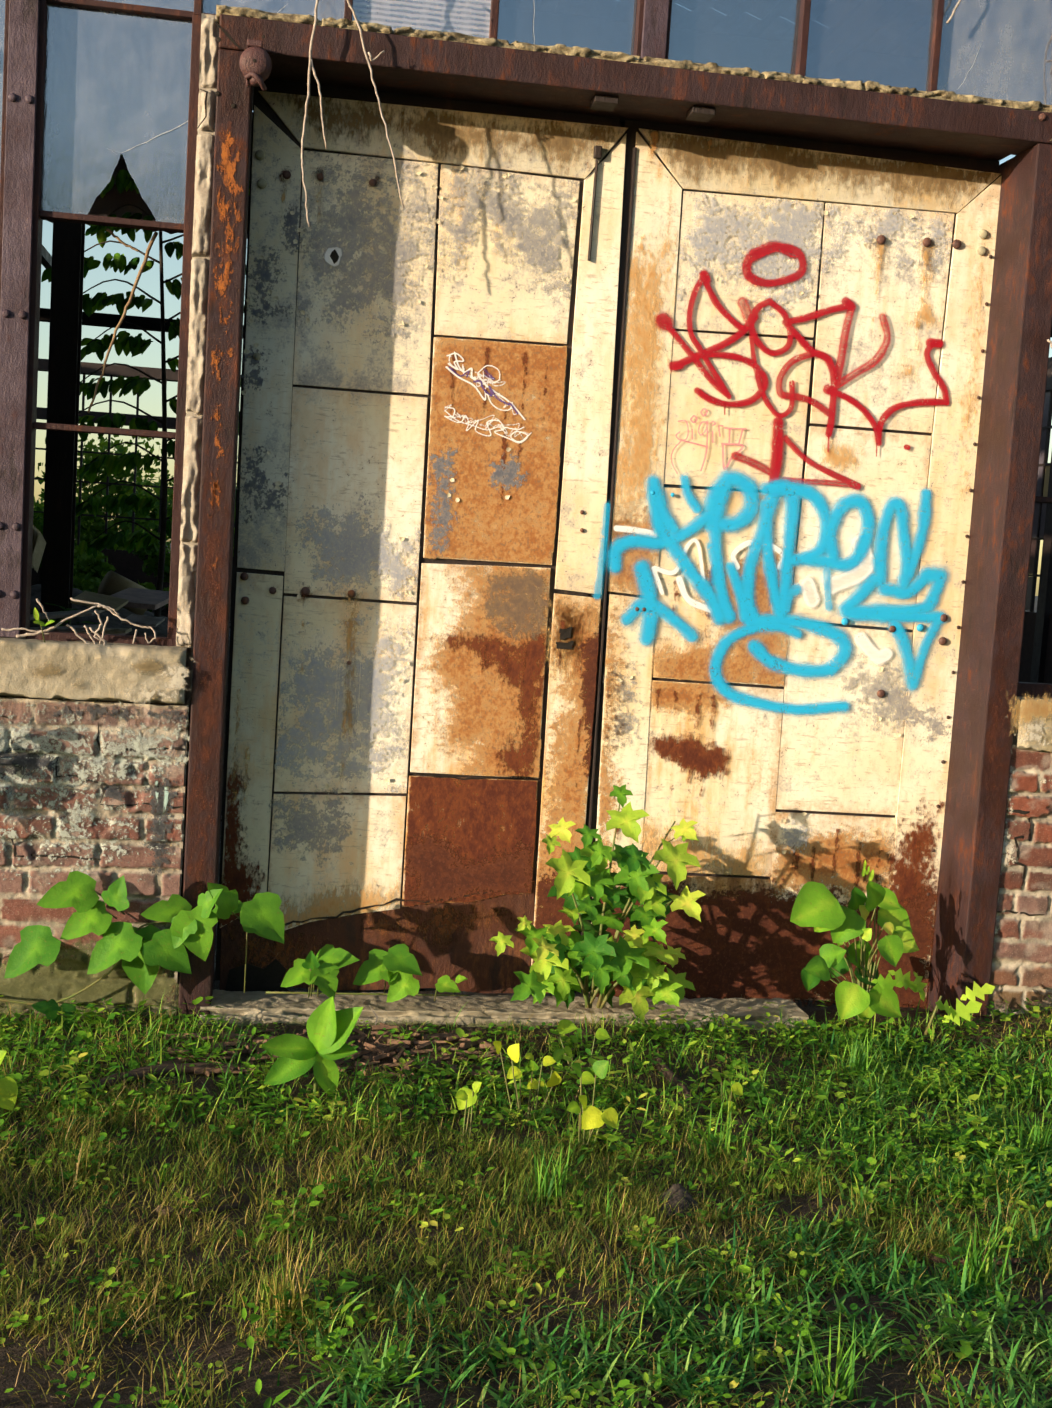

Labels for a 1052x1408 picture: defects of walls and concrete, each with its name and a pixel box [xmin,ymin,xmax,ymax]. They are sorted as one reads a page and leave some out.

corrosion [208,129,243,386]
corrosion [609,237,676,595]
corrosion [187,337,945,1009]